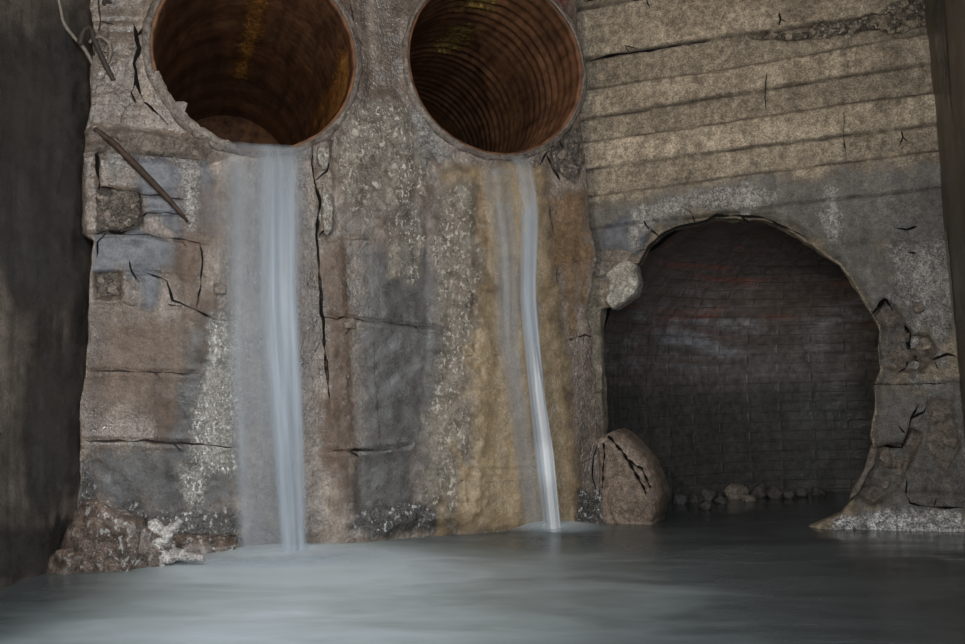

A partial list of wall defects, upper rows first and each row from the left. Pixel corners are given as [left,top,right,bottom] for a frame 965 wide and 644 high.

crack [93,0,167,124]
rust [233,0,270,79]
rust [311,50,350,133]
spalling [750,0,926,41]
damp [0,26,245,536]
crack [94,151,233,321]
crack [311,146,436,457]
rust [433,161,579,536]
spalling [875,303,937,373]
damp [0,515,67,580]